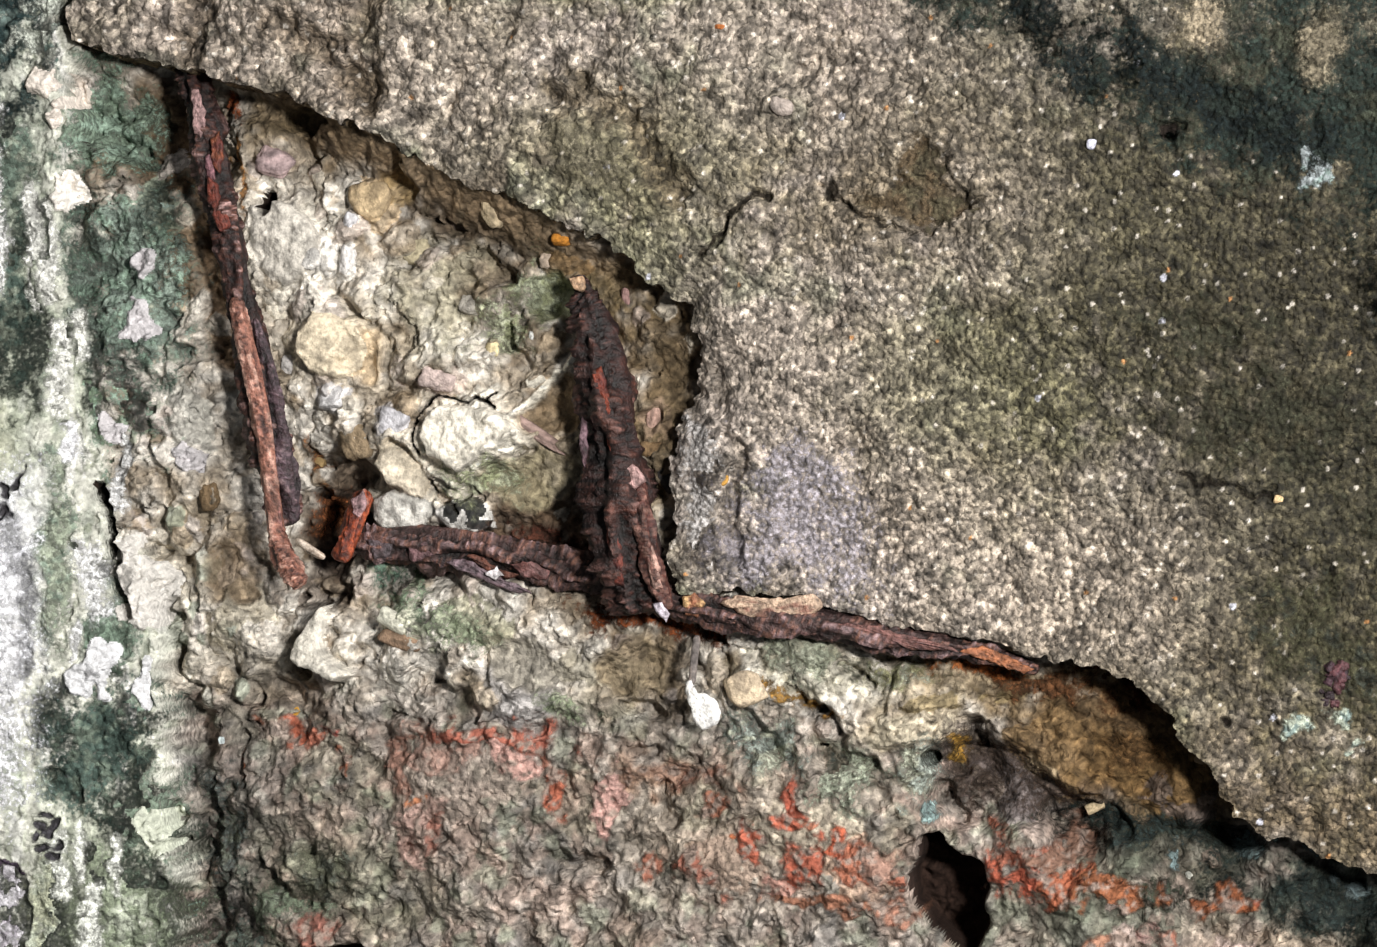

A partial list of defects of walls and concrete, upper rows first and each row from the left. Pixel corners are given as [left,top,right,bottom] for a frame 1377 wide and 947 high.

water stain [1001,0,1352,189]
corrosion [227,90,248,215]
crack [826,182,918,236]
crack [947,151,980,204]
spalling [25,46,1040,675]
crack [99,483,119,560]
corrosion [302,436,348,548]
corrosion [508,522,589,551]
corrosion [569,597,728,648]
flaking render [251,714,351,776]
flaking render [384,717,568,870]